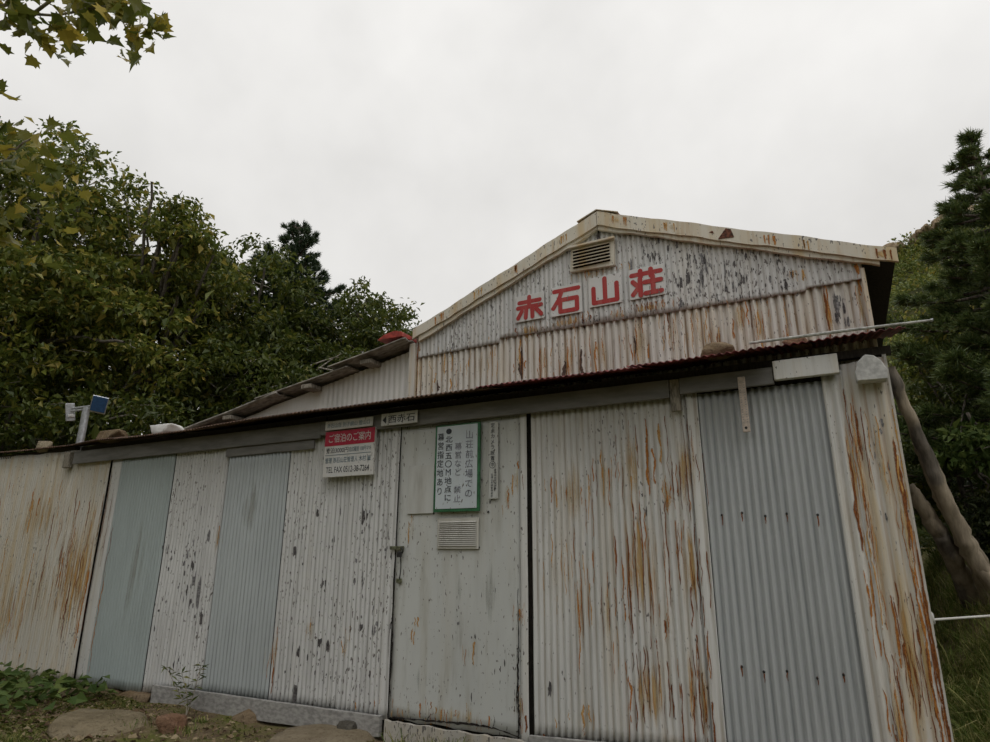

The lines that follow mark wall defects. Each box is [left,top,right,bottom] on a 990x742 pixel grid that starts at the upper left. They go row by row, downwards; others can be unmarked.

peeling [628,237,794,309]
corrosion [710,228,734,239]
corrosion [505,311,604,391]
corrosion [610,299,721,366]
corrosion [726,299,771,347]
corrosion [0,474,114,668]
corrosion [543,416,716,742]
corrosion [843,390,952,742]